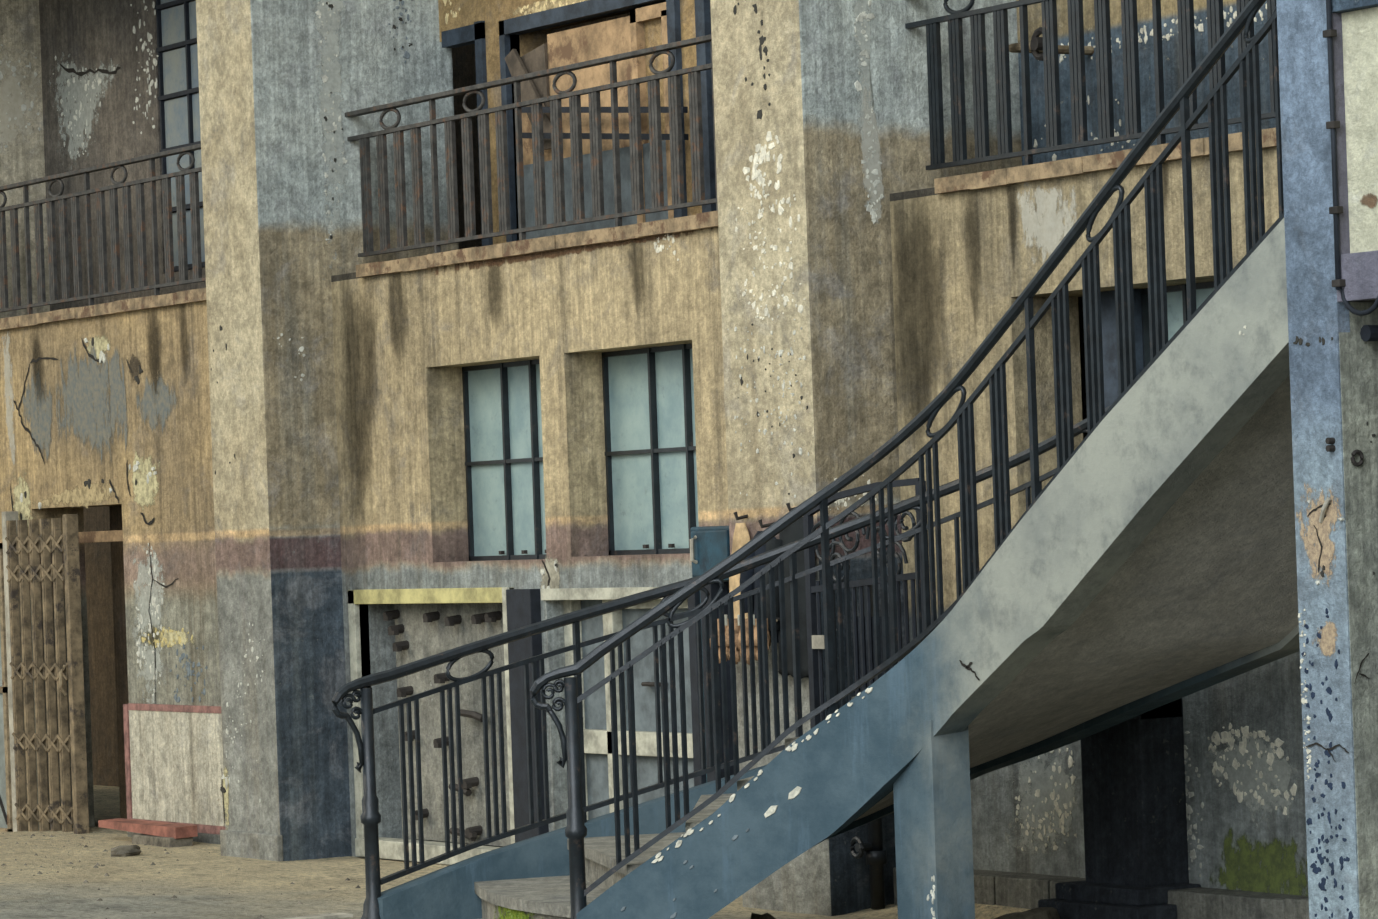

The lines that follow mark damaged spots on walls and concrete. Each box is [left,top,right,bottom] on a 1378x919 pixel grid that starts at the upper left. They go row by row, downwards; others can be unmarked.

peeling [49,56,115,160]
leakage [391,285,404,339]
leakage [489,268,499,310]
leakage [901,236,932,406]
leakage [968,219,978,281]
leakage [1009,188,1076,262]
spalling [1296,484,1345,587]
crack [148,548,179,672]
peeling [652,770,763,869]
peeling [764,786,802,818]
peeling [785,687,873,751]
peeling [1184,608,1354,919]